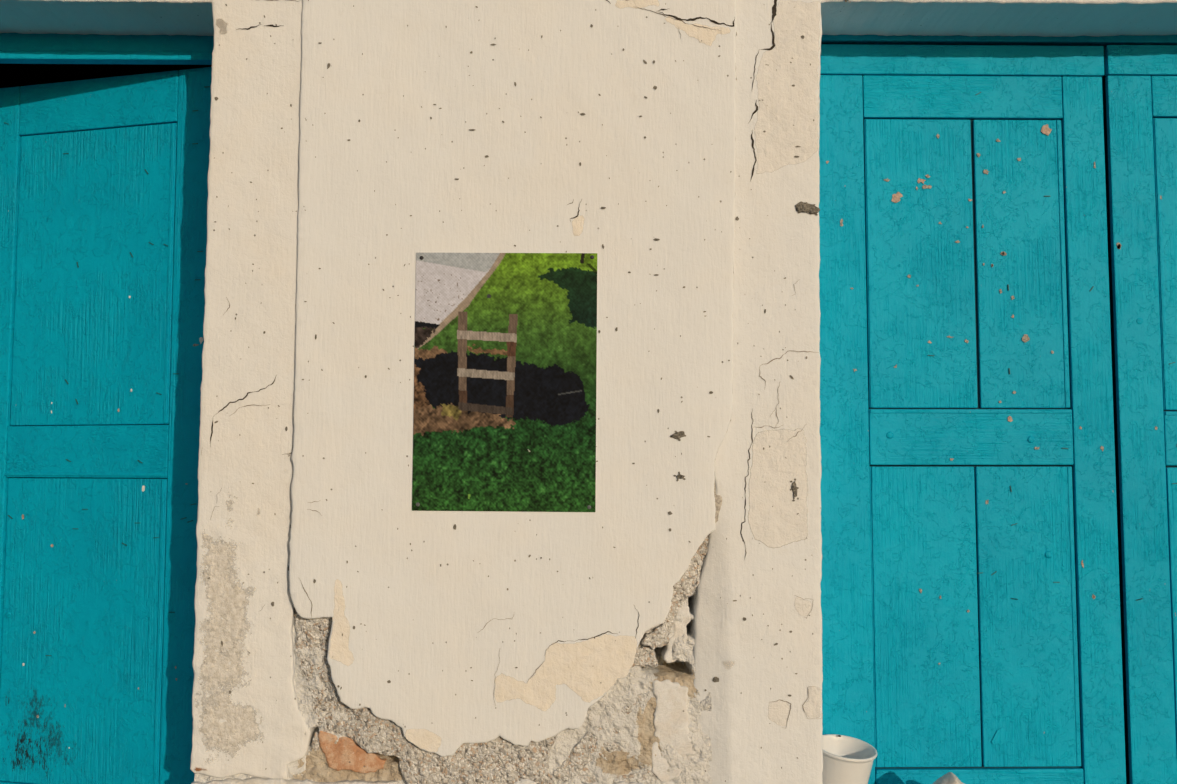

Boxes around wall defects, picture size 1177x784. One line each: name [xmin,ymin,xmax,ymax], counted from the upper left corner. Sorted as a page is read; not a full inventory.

crack [606,0,735,46]
crack [749,0,821,182]
crack [201,377,276,454]
spalling [714,484,722,523]
crack [741,350,811,556]
spalling [191,533,719,784]